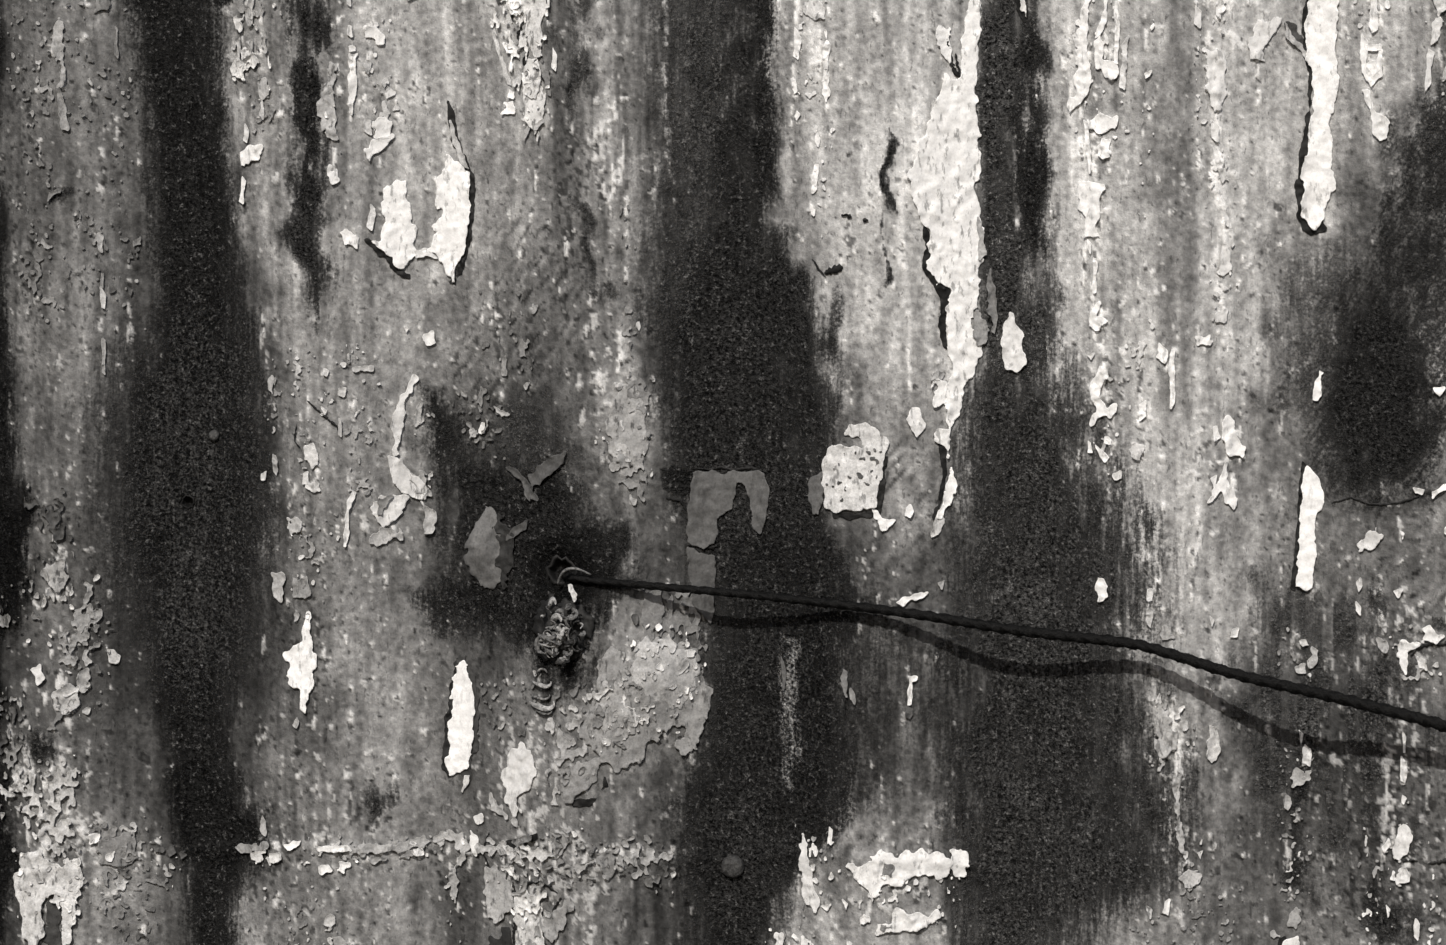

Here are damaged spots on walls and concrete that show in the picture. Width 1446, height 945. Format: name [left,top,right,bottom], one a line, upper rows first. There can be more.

peeling [0,483,187,945]
damp [89,0,282,945]
damp [277,0,339,332]
peeling [267,343,437,729]
peeling [340,100,476,285]
peeling [235,655,680,945]
damp [417,382,643,712]
damp [639,0,894,945]
peeling [765,824,970,945]
peeling [906,0,1028,538]
damp [913,0,1199,945]
damp [1256,78,1446,515]